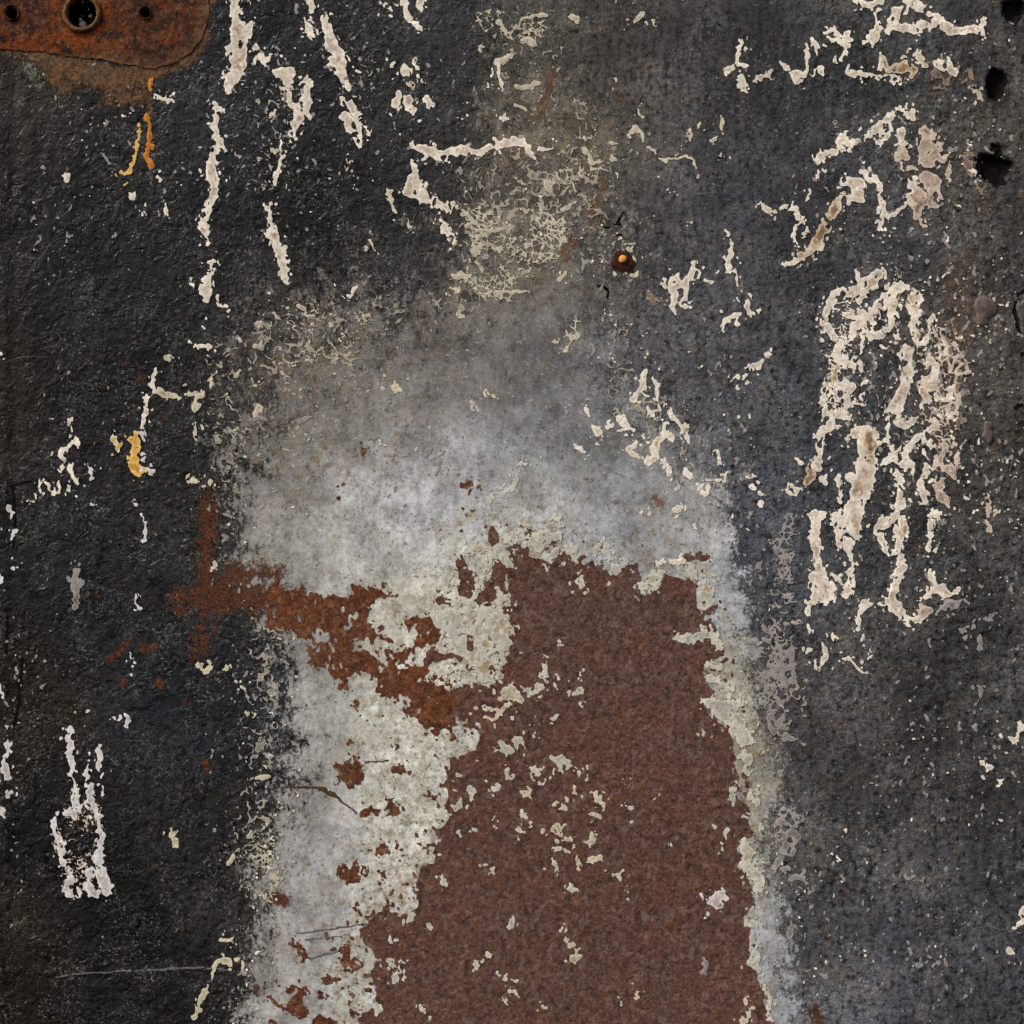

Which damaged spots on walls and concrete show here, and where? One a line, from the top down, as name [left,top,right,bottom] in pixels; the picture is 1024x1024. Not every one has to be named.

corrosion [0,0,216,169]
spalling [723,0,1008,105]
peeling [755,102,1011,268]
peeling [66,562,85,610]
corrosion [105,638,158,663]
peeling [110,0,809,1024]
corrosion [459,479,482,517]
peeling [770,263,975,674]
peeling [50,725,116,901]
corrosion [153,488,783,1024]